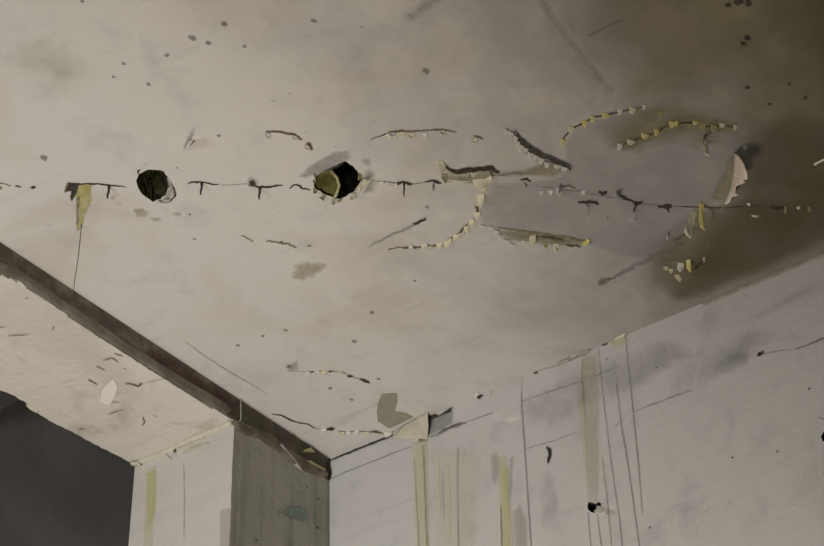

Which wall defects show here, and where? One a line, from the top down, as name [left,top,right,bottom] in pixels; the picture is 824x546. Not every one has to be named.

leakage [614,0,824,292]
crack [69,181,126,189]
spalling [136,169,176,204]
crack [187,181,310,191]
spalling [313,161,371,206]
crack [377,174,442,191]
peeling [387,130,592,252]
crack [493,172,824,222]
peeling [272,407,452,442]
leakage [616,337,642,546]
leakage [413,442,428,546]
leakage [499,458,512,546]